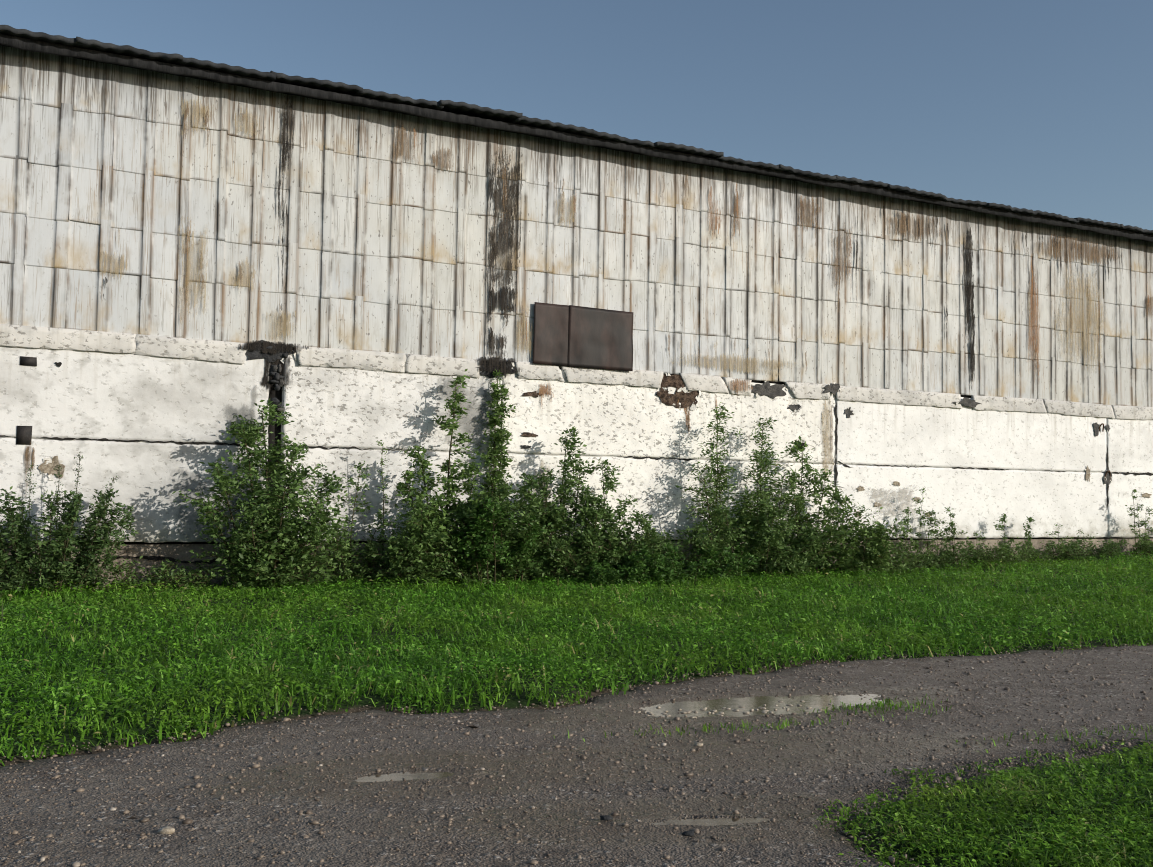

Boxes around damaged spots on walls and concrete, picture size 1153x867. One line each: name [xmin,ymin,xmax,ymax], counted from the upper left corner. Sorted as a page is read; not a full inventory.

leakage [277,102,295,287]
leakage [487,142,522,351]
leakage [883,206,949,253]
leakage [964,220,976,367]
corrosion [1028,256,1040,380]
corrosion [1055,236,1109,370]
peeling [661,373,703,411]
spalling [751,381,801,412]
spalling [38,456,65,480]